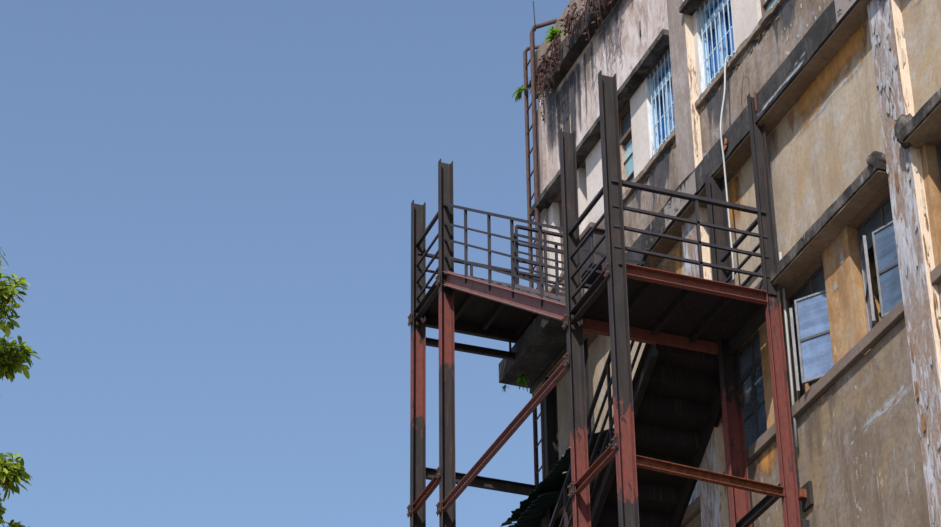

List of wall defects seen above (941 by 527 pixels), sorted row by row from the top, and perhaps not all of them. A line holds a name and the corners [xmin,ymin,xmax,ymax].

spalling [748,6,821,53]
peeling [834,0,856,23]
water stain [545,0,622,159]
peeling [879,28,905,137]
peeling [886,148,919,191]
peeling [930,272,941,347]
peeling [914,381,941,479]